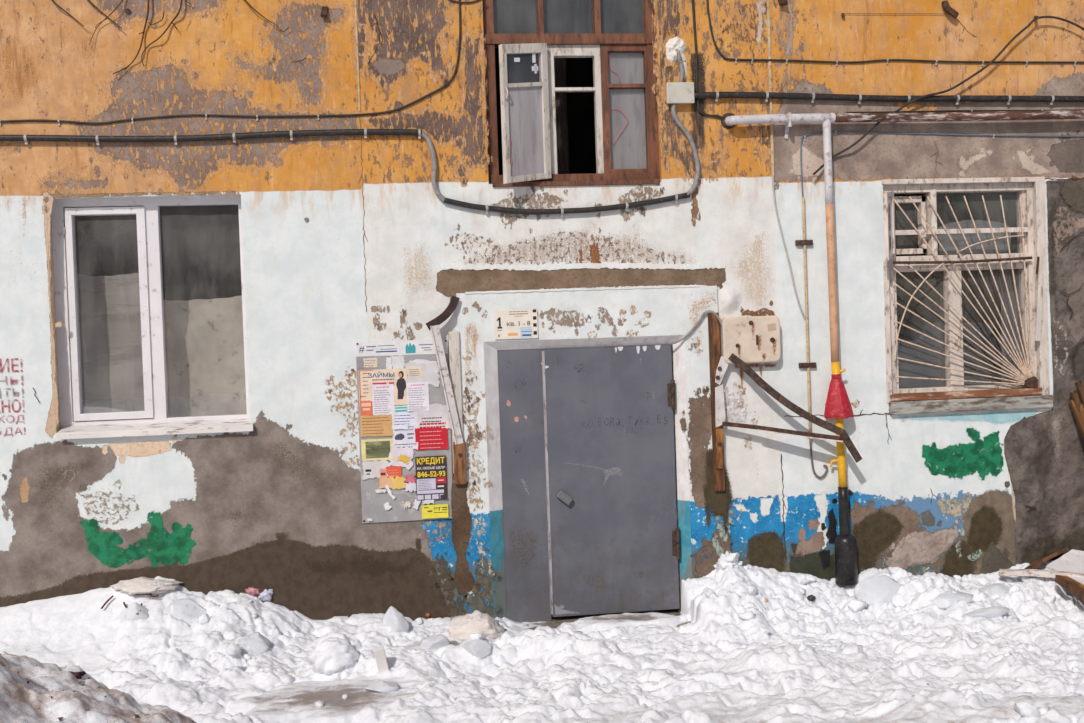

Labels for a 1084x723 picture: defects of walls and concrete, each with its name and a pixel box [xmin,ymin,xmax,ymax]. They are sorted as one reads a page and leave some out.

peeling [619,0,727,222]
peeling [0,0,500,618]
flaking render [436,186,726,318]
peeling [537,305,661,354]
peeling [710,0,1084,576]